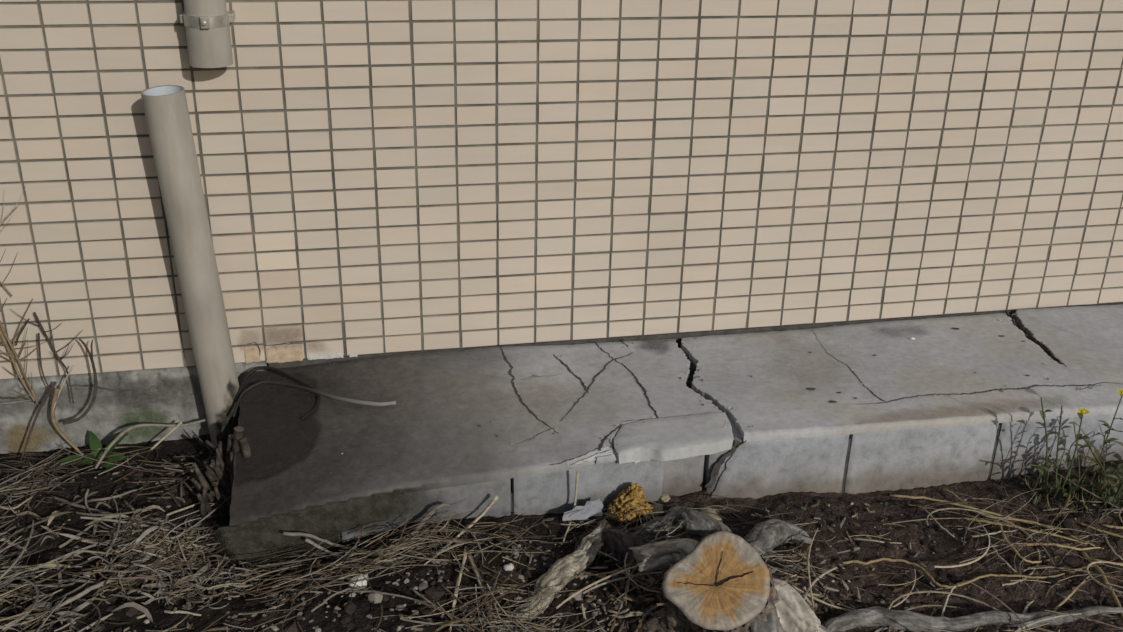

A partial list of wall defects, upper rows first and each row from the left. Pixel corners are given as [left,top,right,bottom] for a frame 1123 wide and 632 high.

water stain [235,373,319,483]
crack [498,339,659,465]
crack [678,345,696,389]
crack [705,438,746,488]
crack [812,311,1122,404]